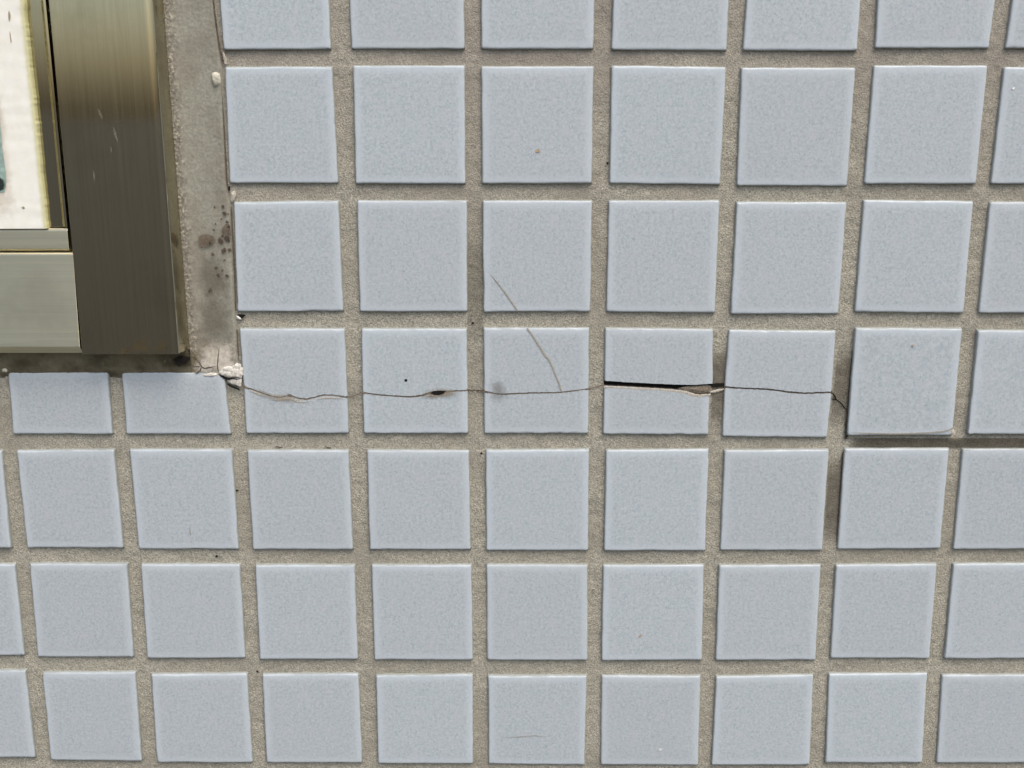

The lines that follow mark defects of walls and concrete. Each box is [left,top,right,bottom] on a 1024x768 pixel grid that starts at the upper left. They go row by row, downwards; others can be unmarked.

peeling [203,363,244,387]
crack [243,273,955,546]